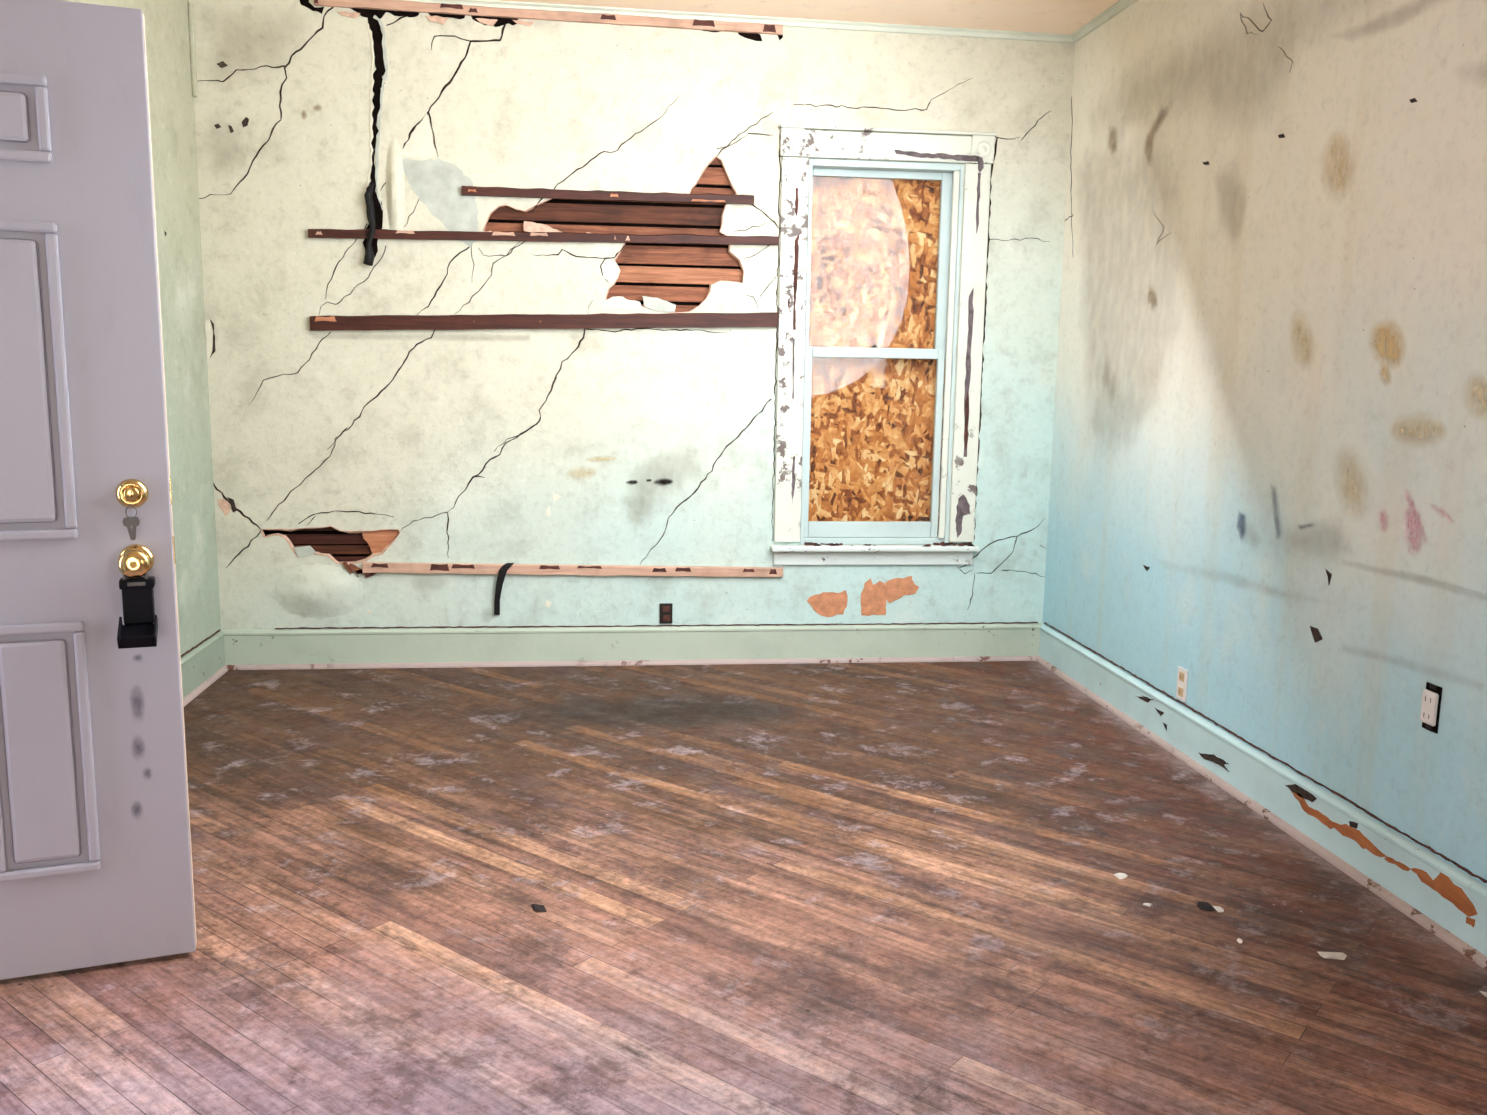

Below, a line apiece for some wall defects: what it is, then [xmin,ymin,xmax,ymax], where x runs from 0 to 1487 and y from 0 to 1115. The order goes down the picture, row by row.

spalling [300,0,535,27]
spalling [738,24,783,41]
crack [1240,3,1293,73]
crack [199,7,506,405]
spalling [400,113,744,313]
peeling [894,150,984,234]
peeling [777,234,799,399]
peeling [963,288,974,457]
spalling [260,526,400,578]
crack [213,78,1487,883]
peeling [807,576,919,617]
peeling [1285,784,1477,927]